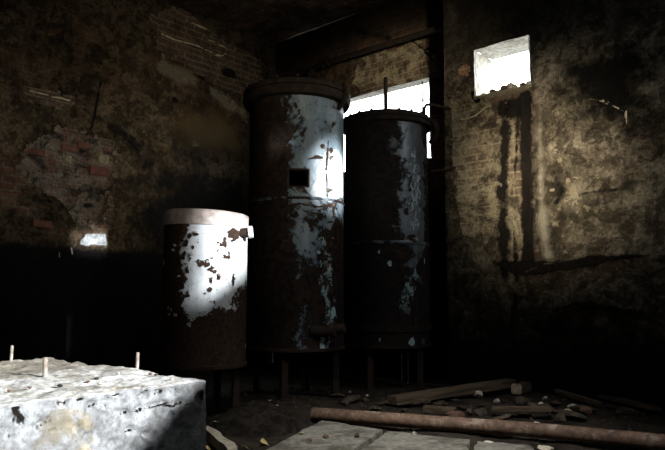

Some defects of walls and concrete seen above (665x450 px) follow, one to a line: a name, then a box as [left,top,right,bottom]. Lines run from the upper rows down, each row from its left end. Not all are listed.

flaking render [149,6,263,101]
spalling [13,125,121,229]
spalling [449,84,532,262]
leakage [492,90,559,281]